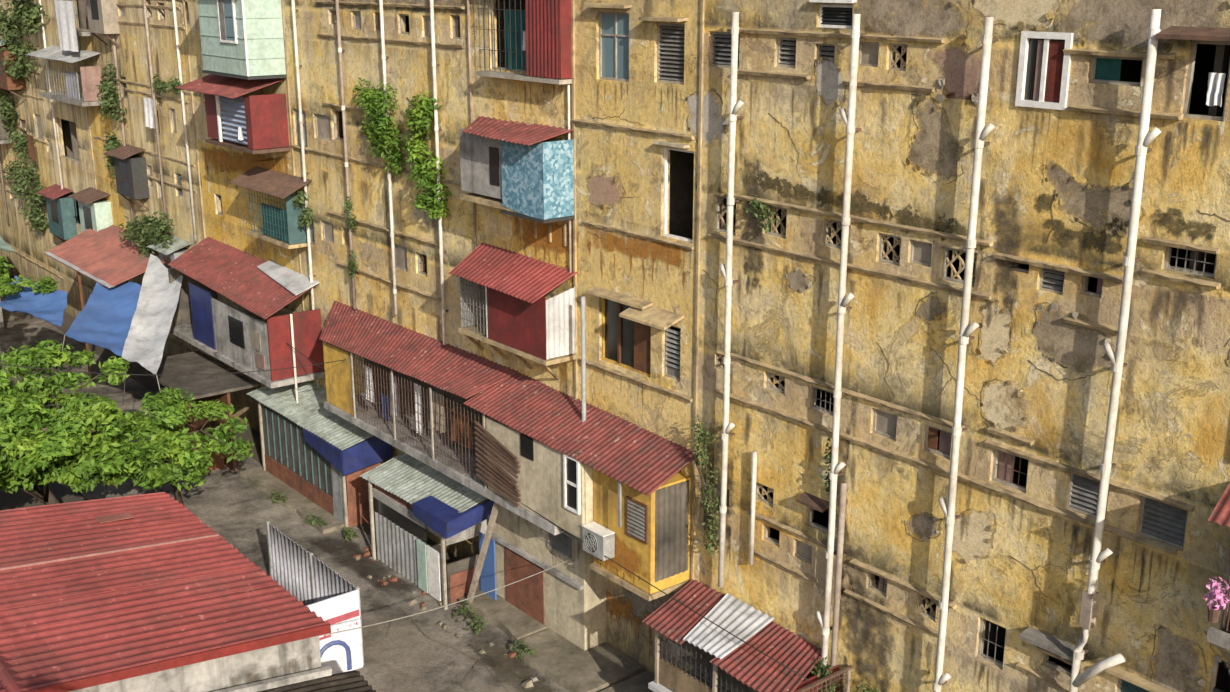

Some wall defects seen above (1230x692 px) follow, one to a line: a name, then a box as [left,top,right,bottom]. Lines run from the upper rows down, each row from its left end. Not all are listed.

flaking render [686,87,729,146]
flaking render [814,56,846,109]
flaking render [857,0,1230,185]
corrosion [514,216,573,263]
flaking render [587,173,626,210]
corrosion [587,229,685,286]
water stain [742,160,966,293]
flaking render [1040,162,1146,237]
flaking render [975,300,1028,432]
flaking render [1032,302,1112,373]
flaking render [904,509,998,564]